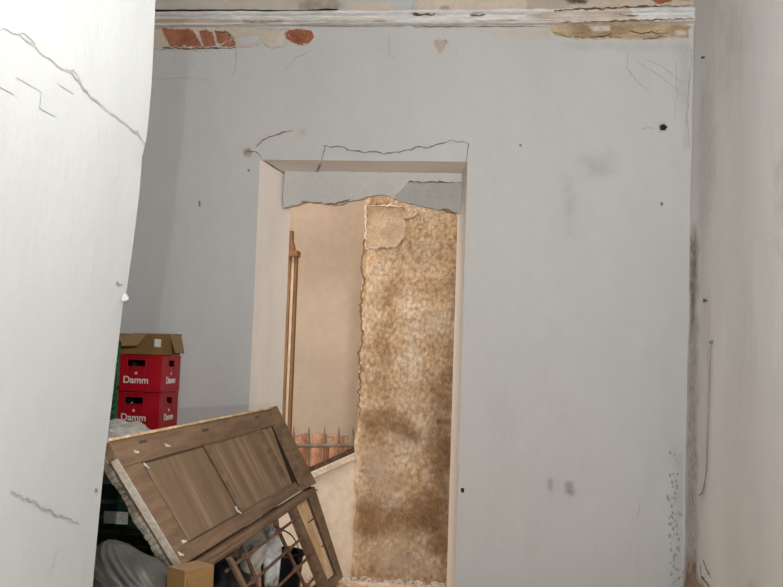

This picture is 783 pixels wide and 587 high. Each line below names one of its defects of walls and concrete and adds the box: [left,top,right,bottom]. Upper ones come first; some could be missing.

spalling [153,0,399,53]
spalling [409,0,693,41]
crack [0,28,145,144]
crack [246,130,293,174]
crack [316,140,469,172]
spalling [364,204,406,250]
crack [11,491,79,524]